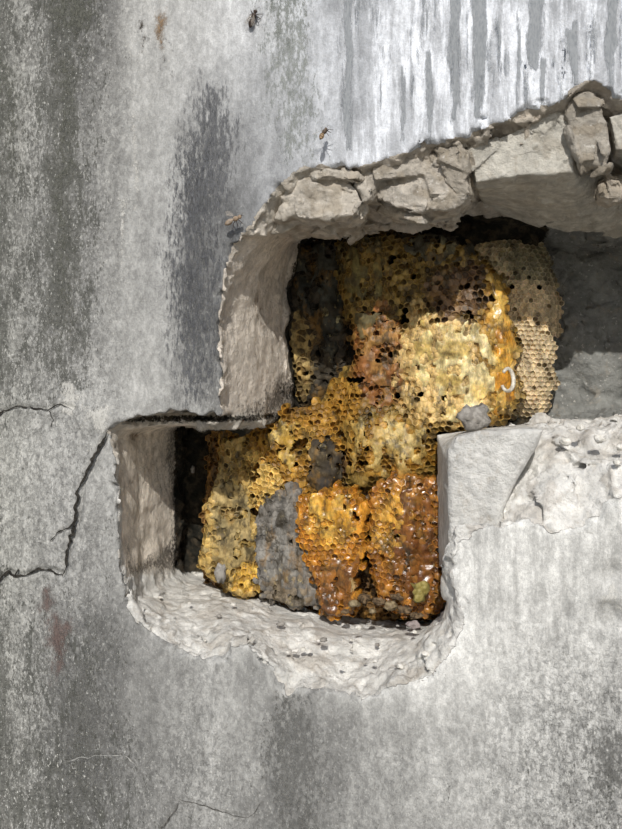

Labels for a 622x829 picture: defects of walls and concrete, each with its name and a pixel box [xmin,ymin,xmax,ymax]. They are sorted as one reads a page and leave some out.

leakage [339,0,381,150]
leakage [400,32,434,145]
leakage [447,0,555,122]
leakage [560,0,622,88]
leakage [165,82,239,411]
crack [0,404,69,426]
spalling [60,80,622,700]
crack [0,431,108,581]
crack [160,800,260,829]